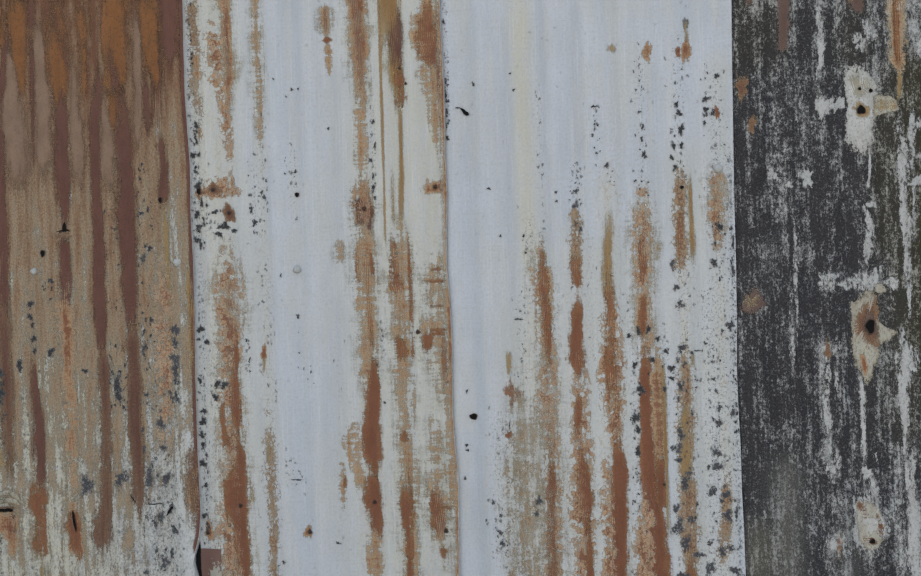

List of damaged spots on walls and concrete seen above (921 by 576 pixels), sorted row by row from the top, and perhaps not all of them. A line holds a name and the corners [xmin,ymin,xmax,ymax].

rust [316,5,334,76]
rust [641,41,652,63]
rust [675,18,692,64]
peeling [843,63,899,156]
rust [671,168,696,281]
rust [0,0,282,576]
rust [333,0,459,576]
rust [495,185,703,576]
peeling [850,283,898,384]
peeling [851,487,891,559]